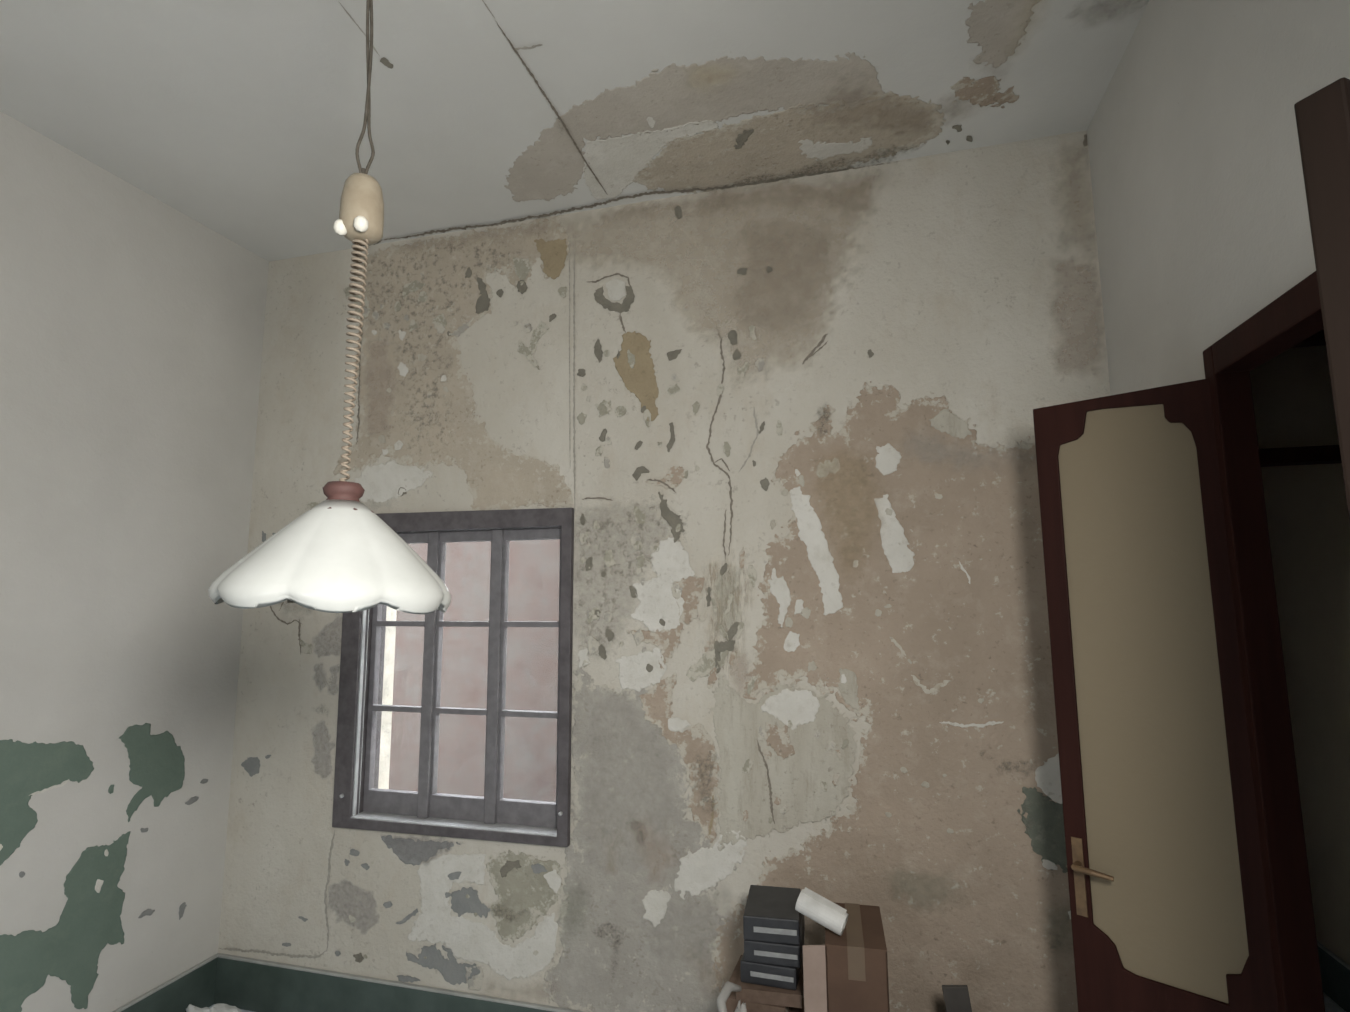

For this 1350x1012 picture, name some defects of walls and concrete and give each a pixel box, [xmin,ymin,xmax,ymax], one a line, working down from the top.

flaking render [504,0,1041,219]
peeling [333,216,612,511]
leakage [579,514,616,577]
flaking render [577,273,700,492]
leakage [629,492,685,599]
crack [373,0,1083,510]
crack [706,322,759,560]
flaking render [728,325,757,345]
flaking render [615,380,1078,1012]
peeling [0,723,208,1012]
peeling [335,951,367,963]
peeling [396,850,563,991]